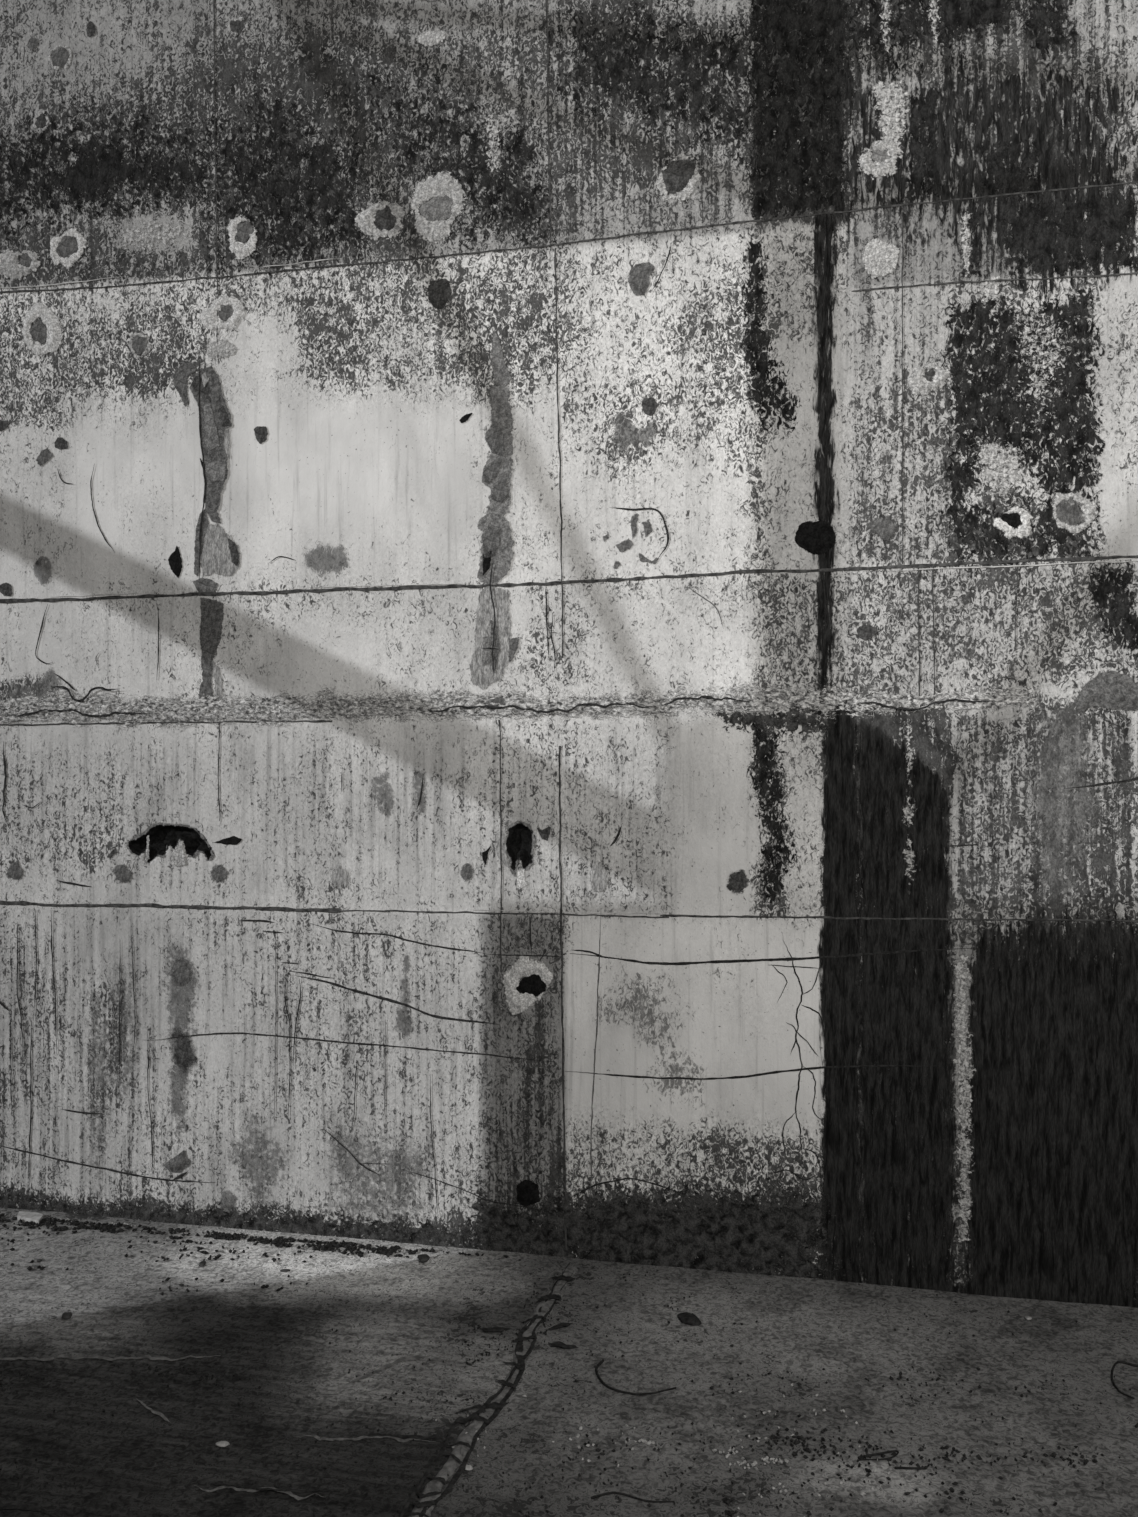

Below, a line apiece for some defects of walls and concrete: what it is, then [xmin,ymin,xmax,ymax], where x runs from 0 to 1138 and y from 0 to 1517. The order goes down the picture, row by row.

spalling [0,228,87,280]
spalling [227,215,257,259]
water stain [0,63,568,283]
spalling [355,171,466,243]
water stain [547,0,1138,657]
peeling [168,361,240,710]
peeling [469,331,519,690]
spalling [107,822,242,866]
spalling [482,821,551,889]
spalling [503,956,553,1015]
water stain [0,545,1138,1308]
crack [389,1264,578,1517]